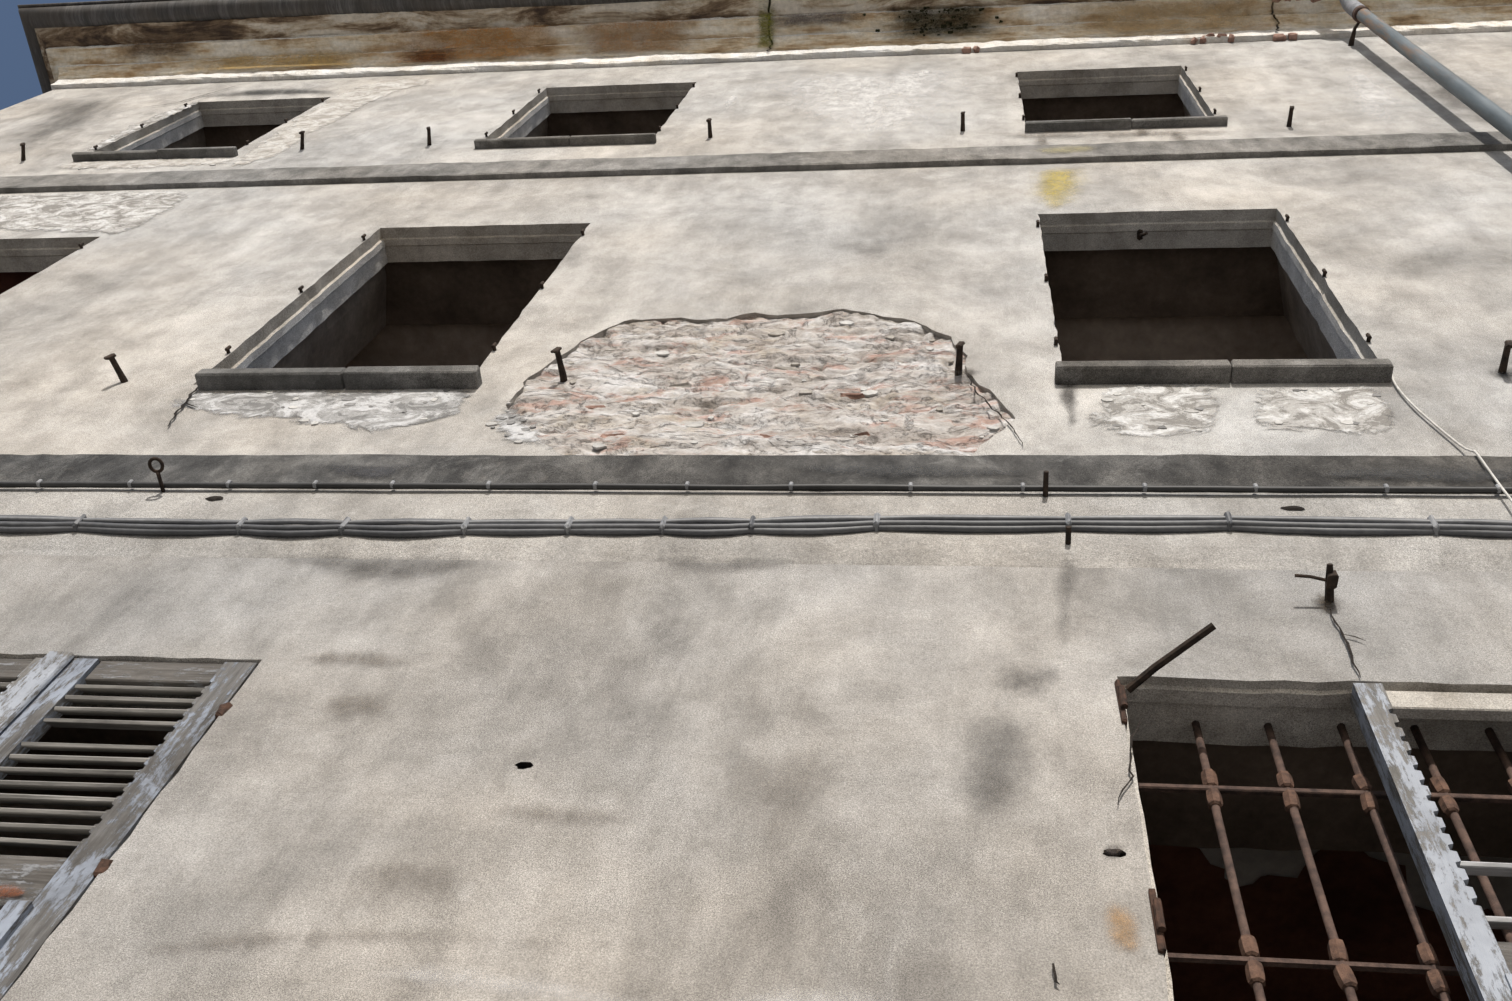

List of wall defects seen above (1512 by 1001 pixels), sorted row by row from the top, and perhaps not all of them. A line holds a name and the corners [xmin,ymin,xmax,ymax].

crack [1271,2,1280,31]
water stain [130,38,188,56]
water stain [212,53,343,69]
peeling [0,191,186,234]
spalling [485,309,1015,456]
peeling [172,388,473,432]
peeling [1090,384,1220,437]
peeling [1254,386,1395,434]